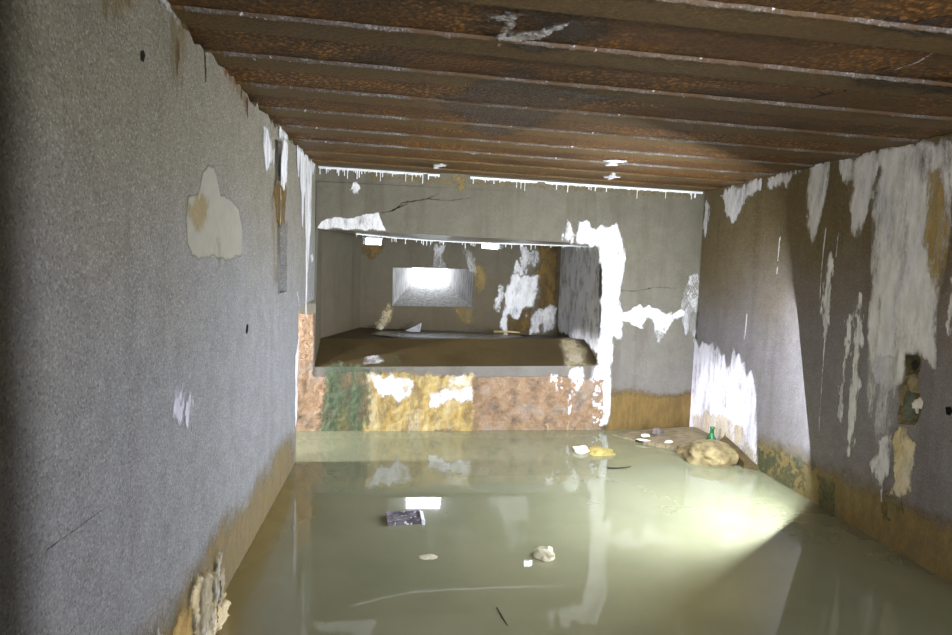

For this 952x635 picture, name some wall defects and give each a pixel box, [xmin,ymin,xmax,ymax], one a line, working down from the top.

damp [184,6,952,94]
damp [654,0,952,37]
damp [223,51,952,584]
damp [173,385,194,429]
spalling [296,313,401,431]
spalling [464,376,604,430]
spalling [897,353,923,425]